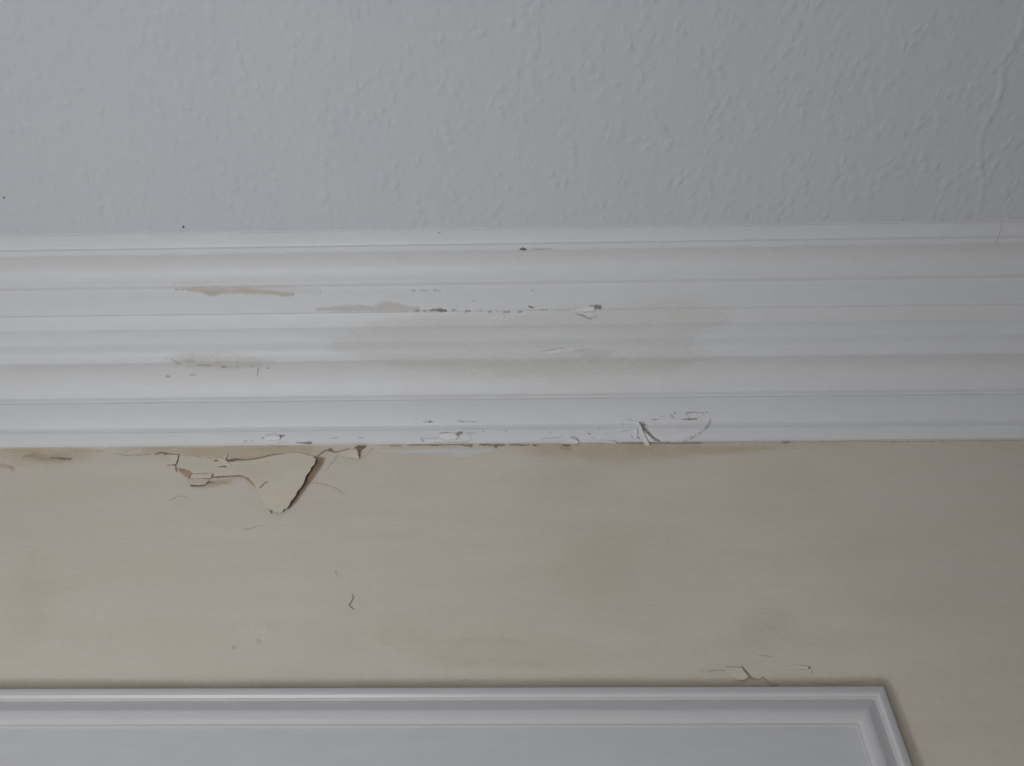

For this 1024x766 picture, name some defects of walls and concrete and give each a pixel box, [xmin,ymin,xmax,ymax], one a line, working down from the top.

water stain [175,288,294,296]
peeling [420,421,477,443]
peeling [543,412,711,446]
water stain [9,448,84,469]
water stain [147,446,312,458]
peeling [155,434,372,513]
crack [725,665,862,686]